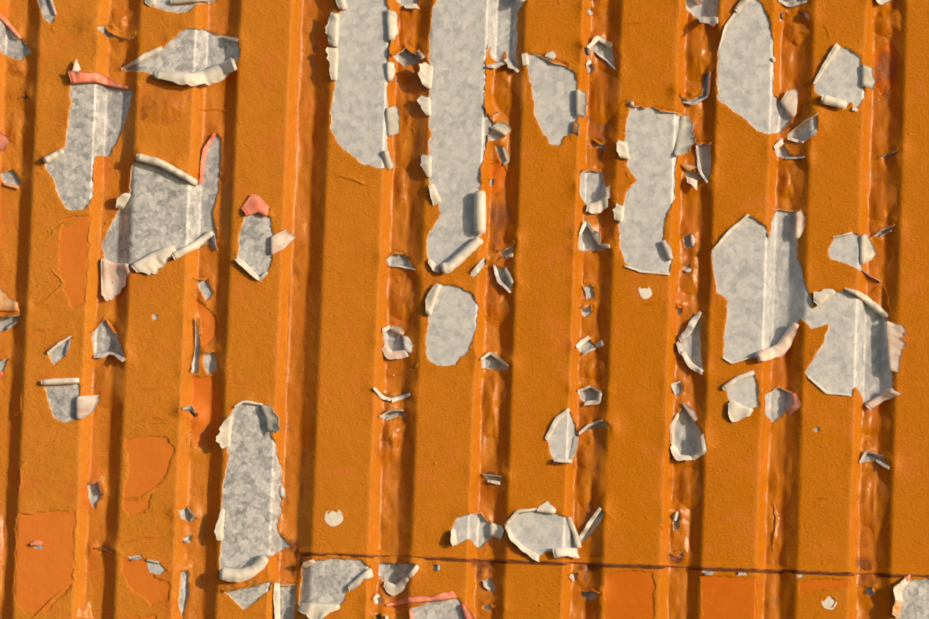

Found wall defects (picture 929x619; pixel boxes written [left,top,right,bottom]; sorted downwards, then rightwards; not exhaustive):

peeling [0,14,31,60]
peeling [121,29,239,86]
peeling [43,59,132,308]
peeling [101,133,221,301]
peeling [325,0,588,366]
peeling [578,0,899,284]
peeling [91,315,126,362]
peeling [676,311,703,375]
peeling [711,206,907,422]
peeling [183,276,475,619]
peeling [450,501,603,562]
peeling [892,574,929,619]